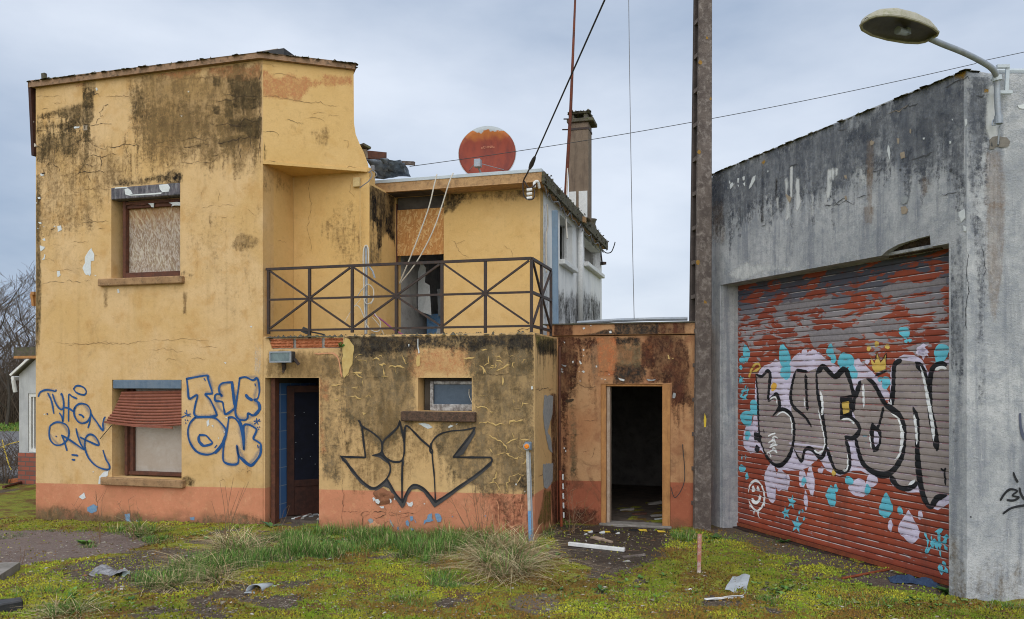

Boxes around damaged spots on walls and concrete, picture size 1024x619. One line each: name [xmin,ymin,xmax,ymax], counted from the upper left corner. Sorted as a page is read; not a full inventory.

water stain [36,82,132,344]
peeling [83,248,96,276]
crack [37,63,339,249]
water stain [129,64,265,180]
spalling [270,338,354,378]
crack [325,354,407,464]
water stain [372,198,395,249]
water stain [255,310,691,535]
peeling [773,295,833,312]
water stain [712,74,998,250]
peeling [808,318,910,348]
peeling [881,277,947,298]